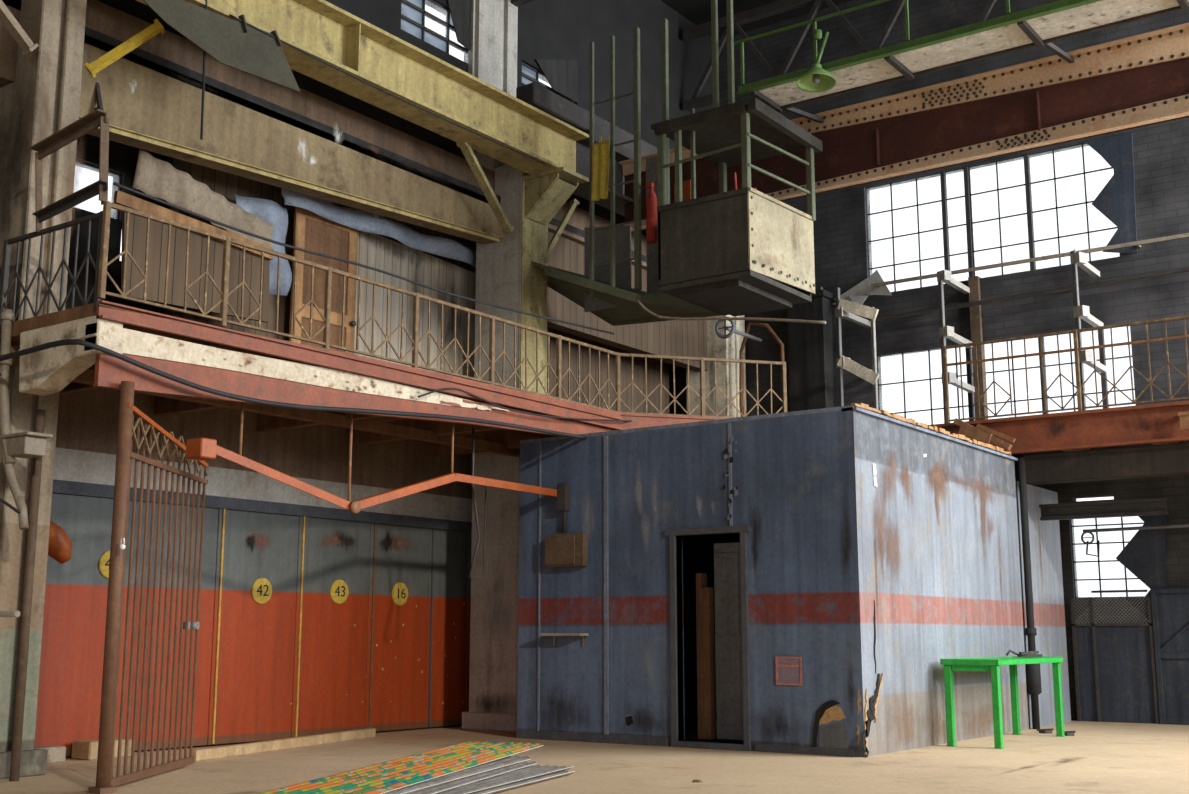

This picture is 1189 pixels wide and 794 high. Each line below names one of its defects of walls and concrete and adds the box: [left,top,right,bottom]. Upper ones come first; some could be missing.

rust [886,457,910,493]
rust [930,467,946,519]
rust [965,483,992,534]
rust [875,510,899,603]
spalling [812,689,861,749]